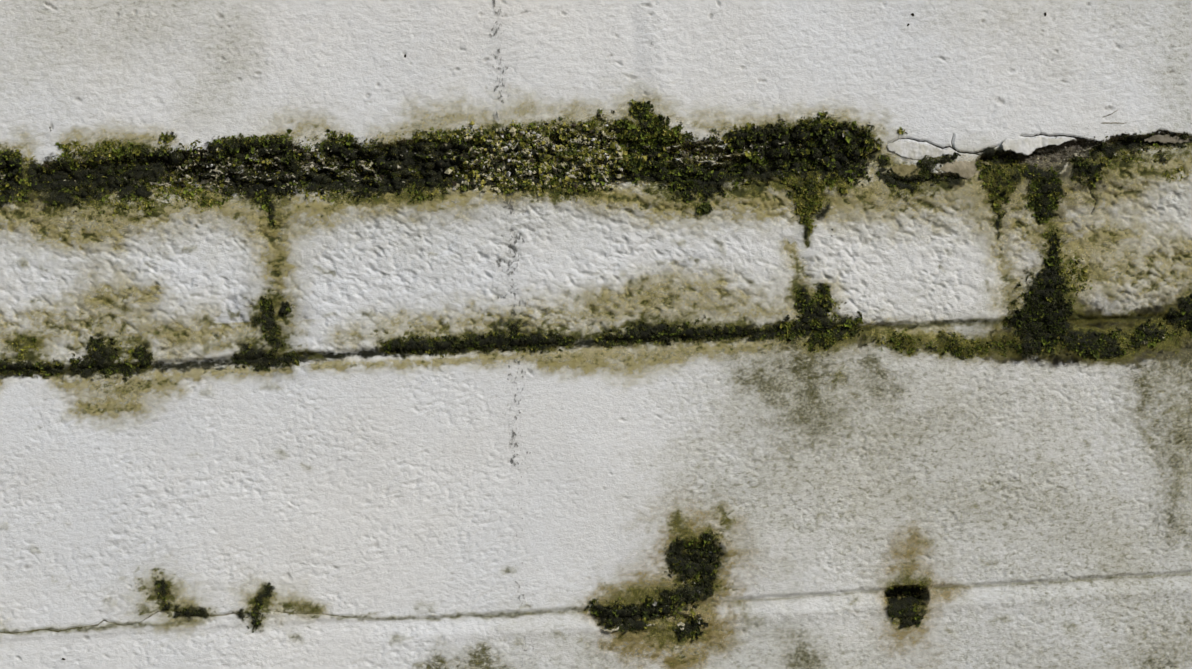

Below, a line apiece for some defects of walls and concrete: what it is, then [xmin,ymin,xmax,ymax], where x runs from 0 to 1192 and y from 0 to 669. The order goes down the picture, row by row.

leakage [377,0,535,145]
leakage [61,129,171,151]
crack [892,137,997,156]
crack [1023,110,1124,142]
crack [1152,123,1192,137]
leakage [816,109,1192,354]
leakage [0,181,799,419]
leakage [310,229,963,483]
leakage [1061,309,1192,383]
leakage [1135,367,1192,535]
crack [0,610,238,634]
crack [273,610,357,618]